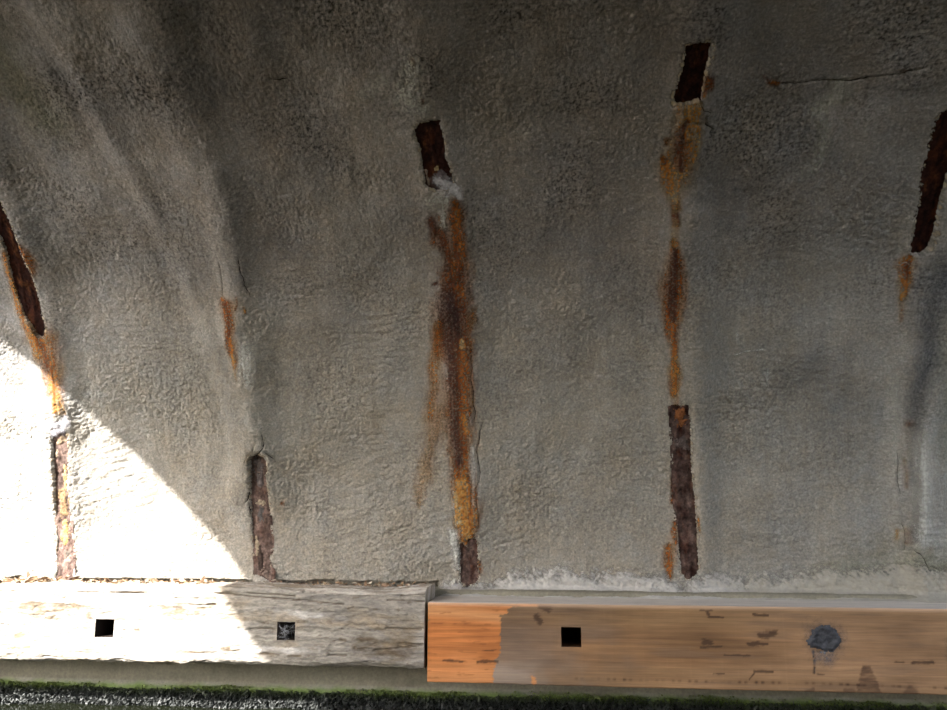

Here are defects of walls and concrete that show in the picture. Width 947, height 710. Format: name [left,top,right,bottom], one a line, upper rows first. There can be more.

spalling [671,40,714,107]
crack [783,68,923,83]
spalling [0,201,47,336]
corrosion [2,252,65,414]
corrosion [220,297,246,369]
spalling [414,120,454,192]
corrosion [417,198,479,545]
corrosion [660,76,715,406]
corrosion [897,254,913,319]
spalling [910,110,947,253]
water stain [912,271,947,545]
corrosion [663,521,677,580]